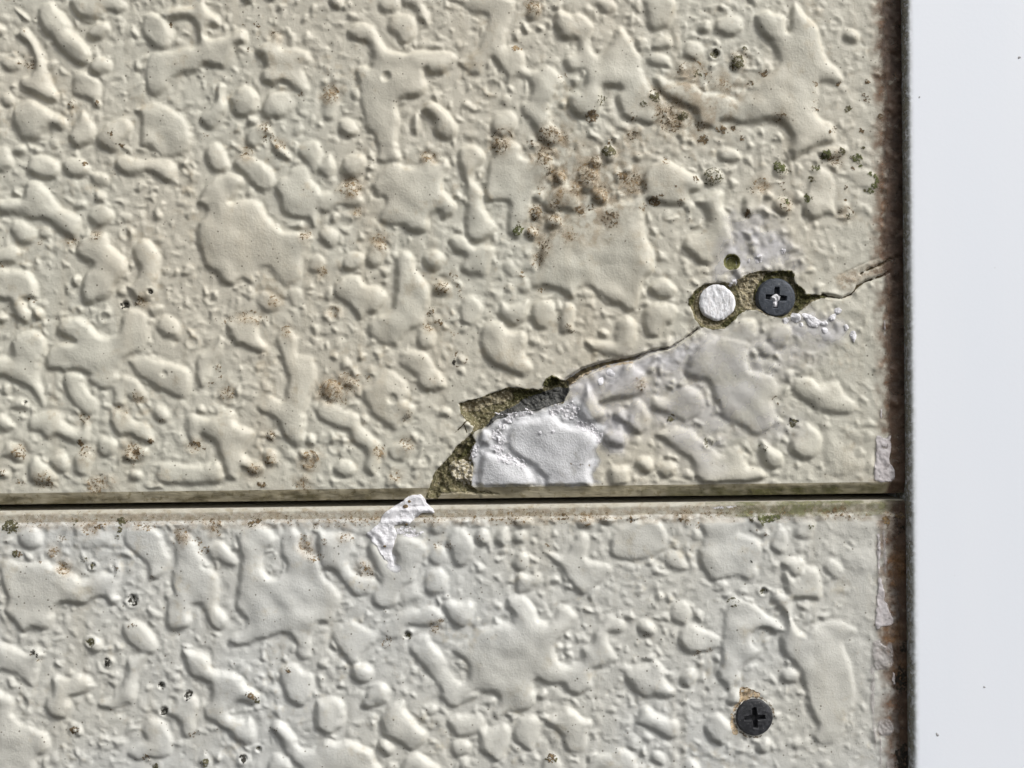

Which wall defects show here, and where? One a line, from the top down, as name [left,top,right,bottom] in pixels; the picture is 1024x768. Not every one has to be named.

spalling [688,270,857,342]
crack [821,255,901,299]
crack [566,328,698,386]
peeling [367,375,607,572]